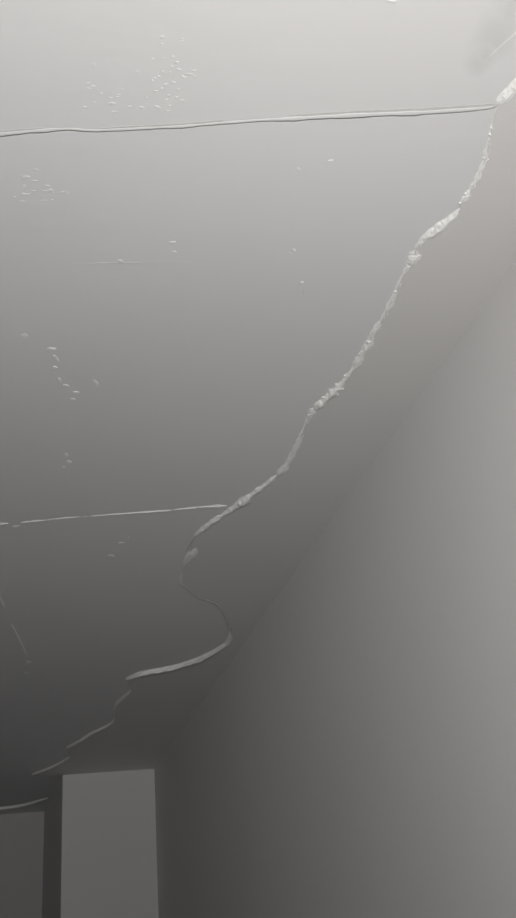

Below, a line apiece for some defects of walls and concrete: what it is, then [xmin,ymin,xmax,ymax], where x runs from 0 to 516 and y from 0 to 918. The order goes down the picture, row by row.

crack [0,78,516,775]